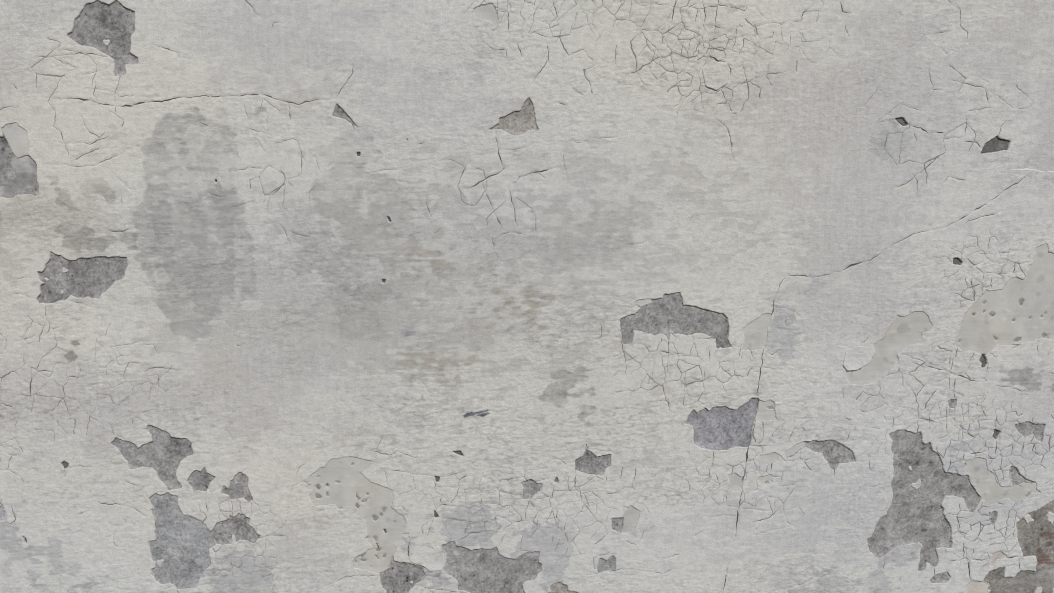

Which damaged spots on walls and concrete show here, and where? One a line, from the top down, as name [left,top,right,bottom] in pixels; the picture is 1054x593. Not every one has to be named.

peeling [68,0,138,76]
crack [465,0,849,158]
crack [866,0,1034,195]
peeling [38,252,128,303]
crack [0,277,179,520]
peeling [111,425,261,589]
peeling [441,541,542,593]
crack [450,139,581,272]
peeling [620,292,731,349]
crack [677,421,835,535]
crack [842,338,1054,582]
peeling [867,430,1054,593]